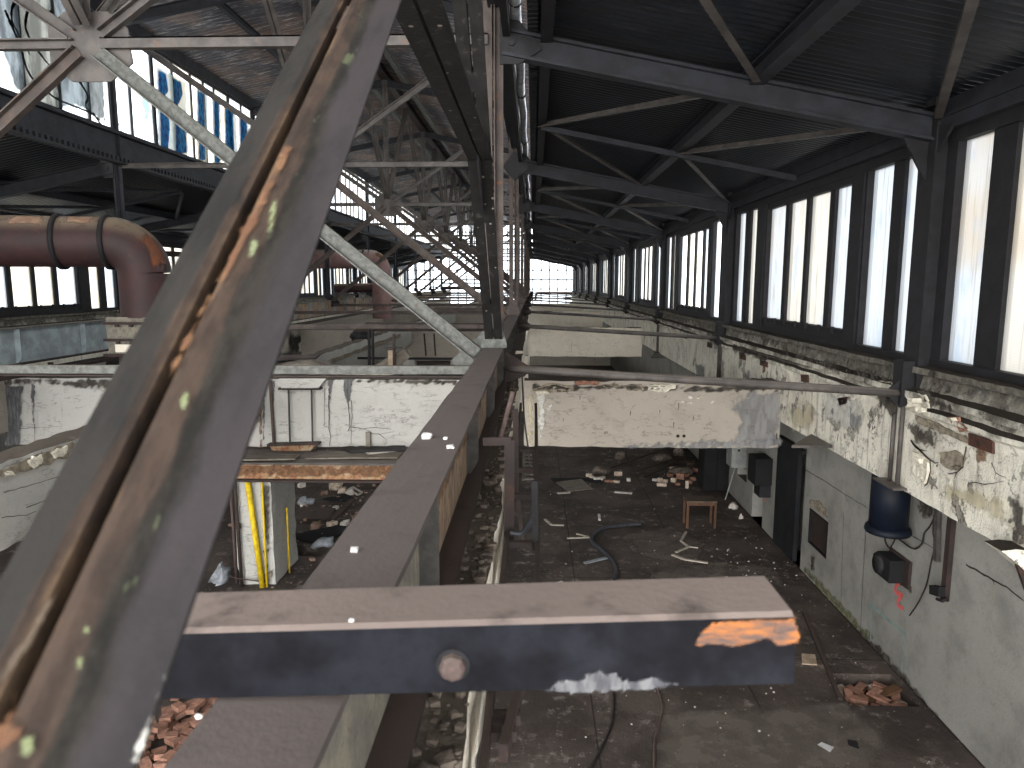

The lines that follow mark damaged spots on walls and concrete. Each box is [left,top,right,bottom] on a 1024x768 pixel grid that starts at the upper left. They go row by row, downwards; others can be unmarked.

corrosion [220,146,291,280]
corrosion [172,332,192,369]
water stain [4,378,109,446]
corrosion [238,465,393,477]
flaking render [906,393,968,484]
crack [966,564,1024,601]